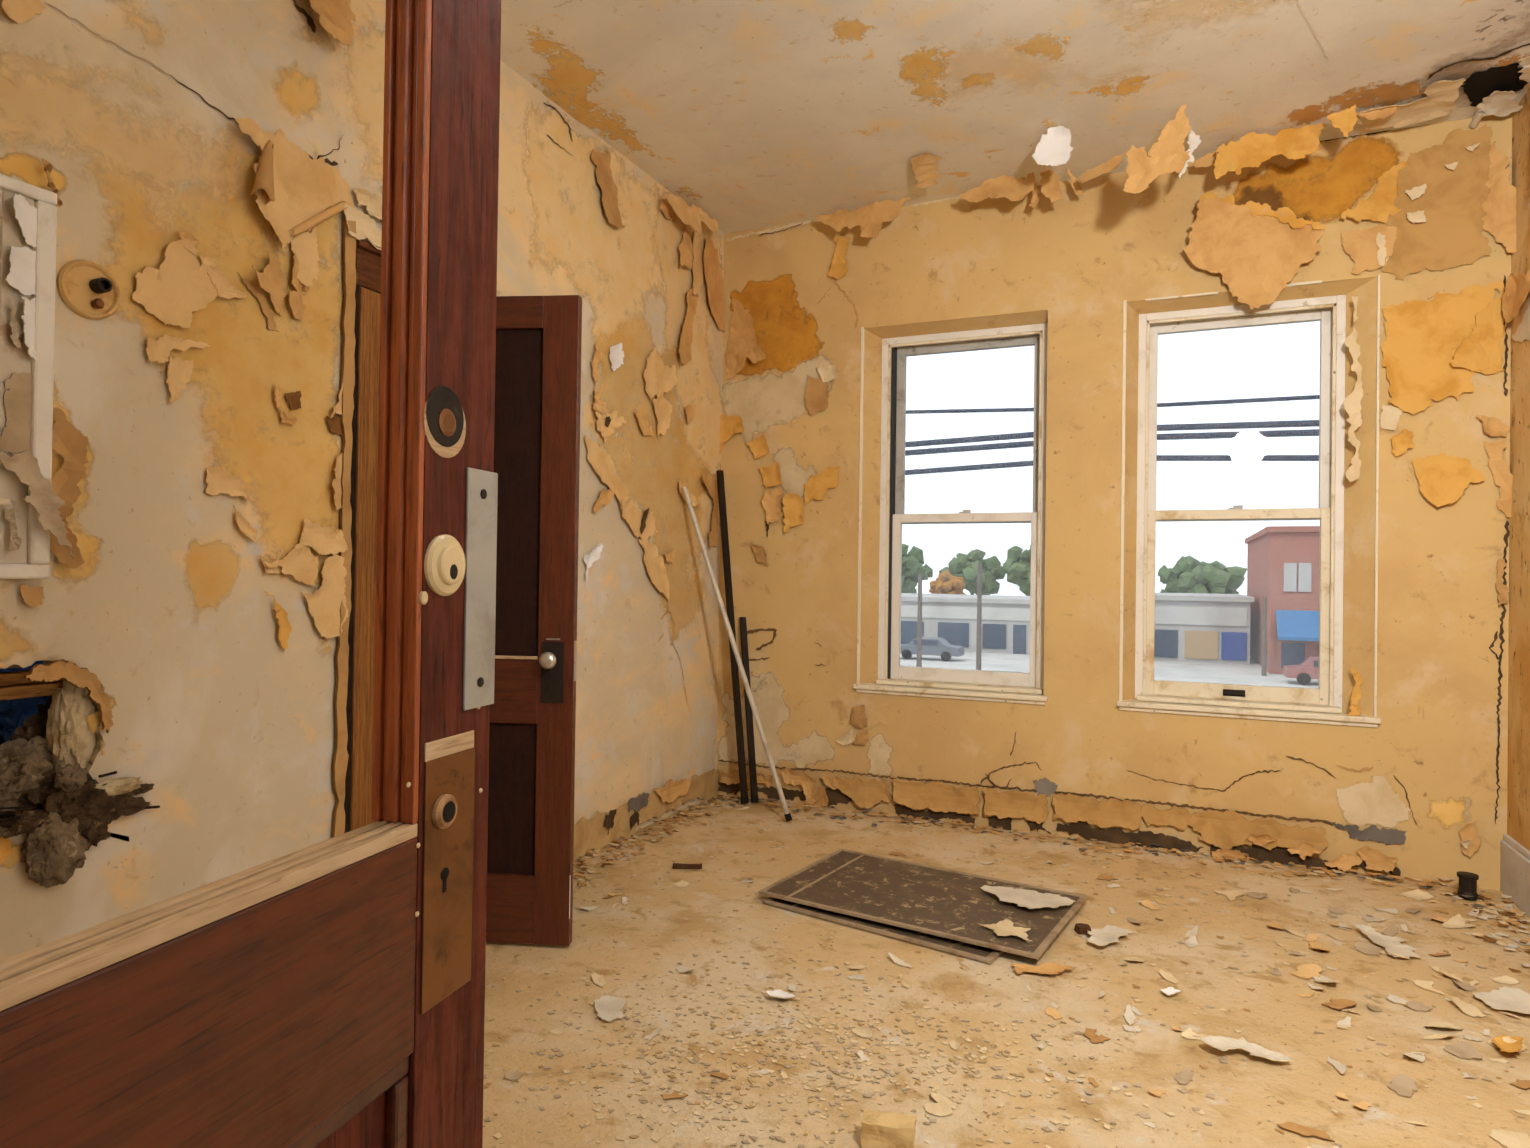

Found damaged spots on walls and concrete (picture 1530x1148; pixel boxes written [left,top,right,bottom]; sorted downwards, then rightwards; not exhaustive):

crack [45,2,238,124]
crack [293,0,315,33]
crack [308,136,343,166]
water stain [833,19,874,43]
water stain [900,47,993,106]
peeling [959,43,1530,310]
water stain [1233,136,1400,223]
water stain [1288,81,1426,128]
peeling [131,117,382,404]
peeling [1380,268,1530,517]
spalling [0,660,160,888]
flaking render [569,672,1411,919]